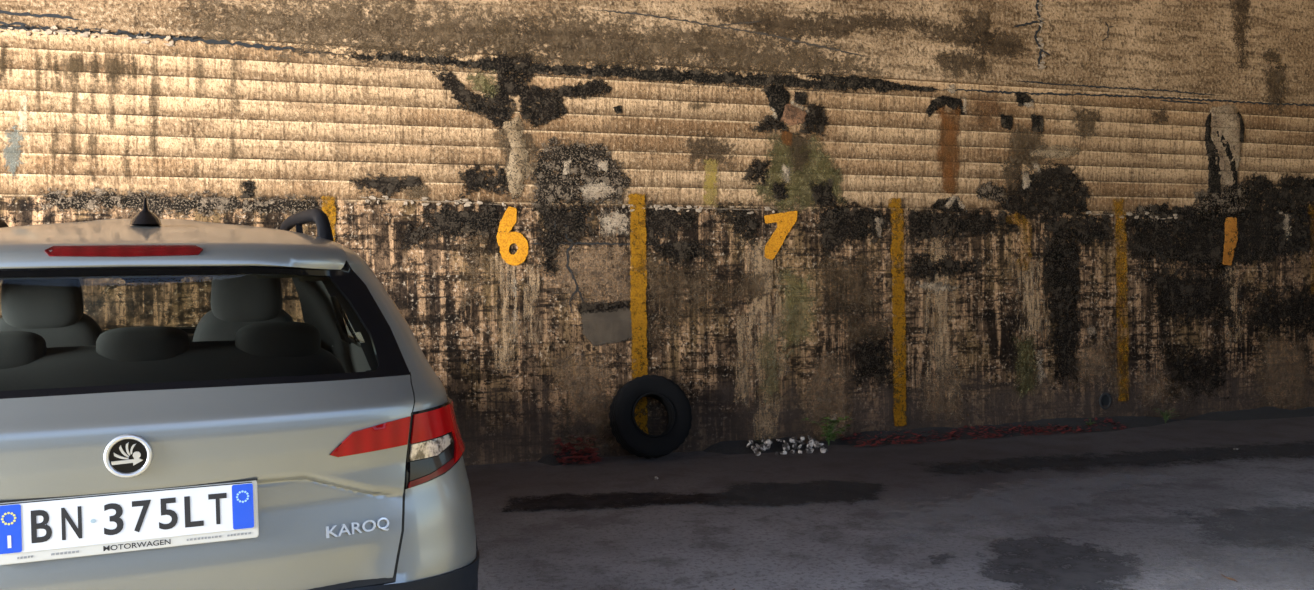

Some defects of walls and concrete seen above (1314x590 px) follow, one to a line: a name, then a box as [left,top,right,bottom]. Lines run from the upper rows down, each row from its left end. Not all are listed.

damp [2,49,323,218]
damp [167,0,1029,374]
crack [0,0,1314,106]
damp [811,158,1314,424]